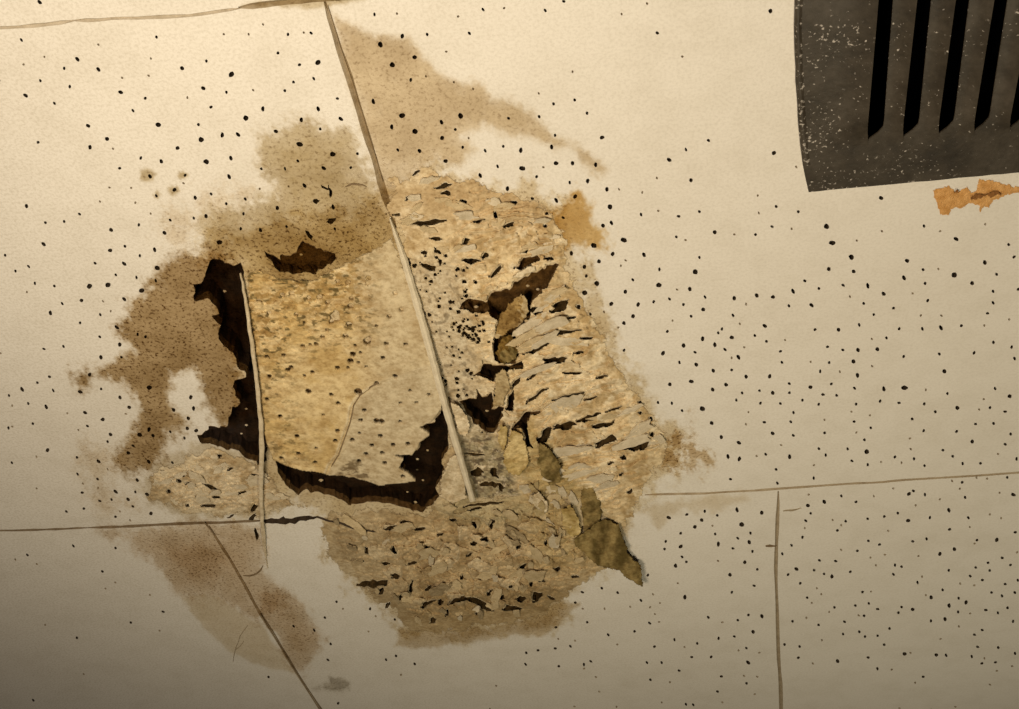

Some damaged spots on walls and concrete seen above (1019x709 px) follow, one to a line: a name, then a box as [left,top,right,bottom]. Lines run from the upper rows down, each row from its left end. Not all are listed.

water stain [248,145,367,281]
corrosion [933,179,1019,215]
water stain [100,246,250,471]
spalling [321,167,667,635]
spalling [146,447,308,519]